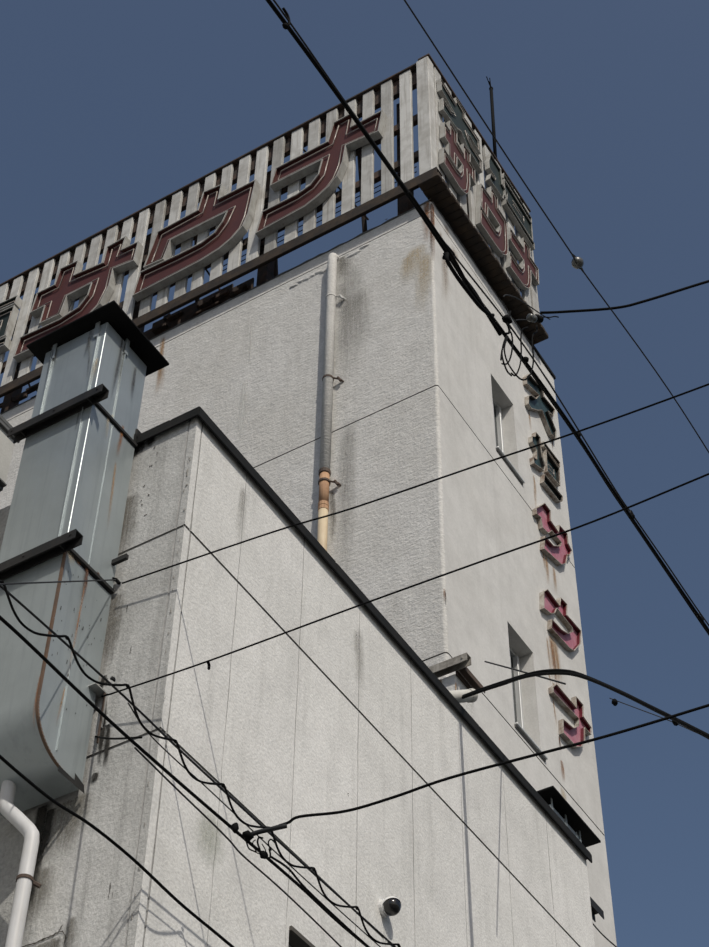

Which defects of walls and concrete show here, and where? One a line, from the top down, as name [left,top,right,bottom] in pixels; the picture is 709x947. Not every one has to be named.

water stain [98,702,110,761]
water stain [28,794,88,908]
water stain [38,918,74,947]